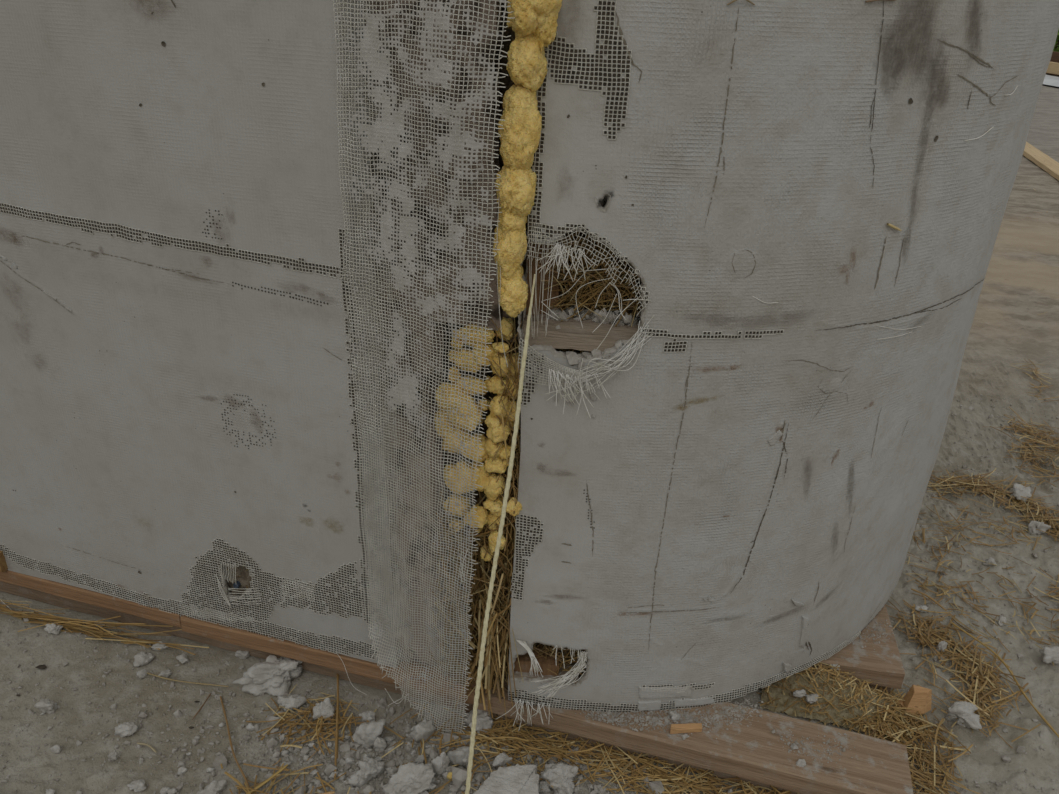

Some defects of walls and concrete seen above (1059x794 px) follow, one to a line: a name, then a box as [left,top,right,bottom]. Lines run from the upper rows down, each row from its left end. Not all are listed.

peeling [544,0,632,140]
spalling [517,223,649,420]
crack [824,277,986,330]
spalling [369,153,403,666]
peeling [178,538,366,622]
peeling [510,514,544,615]